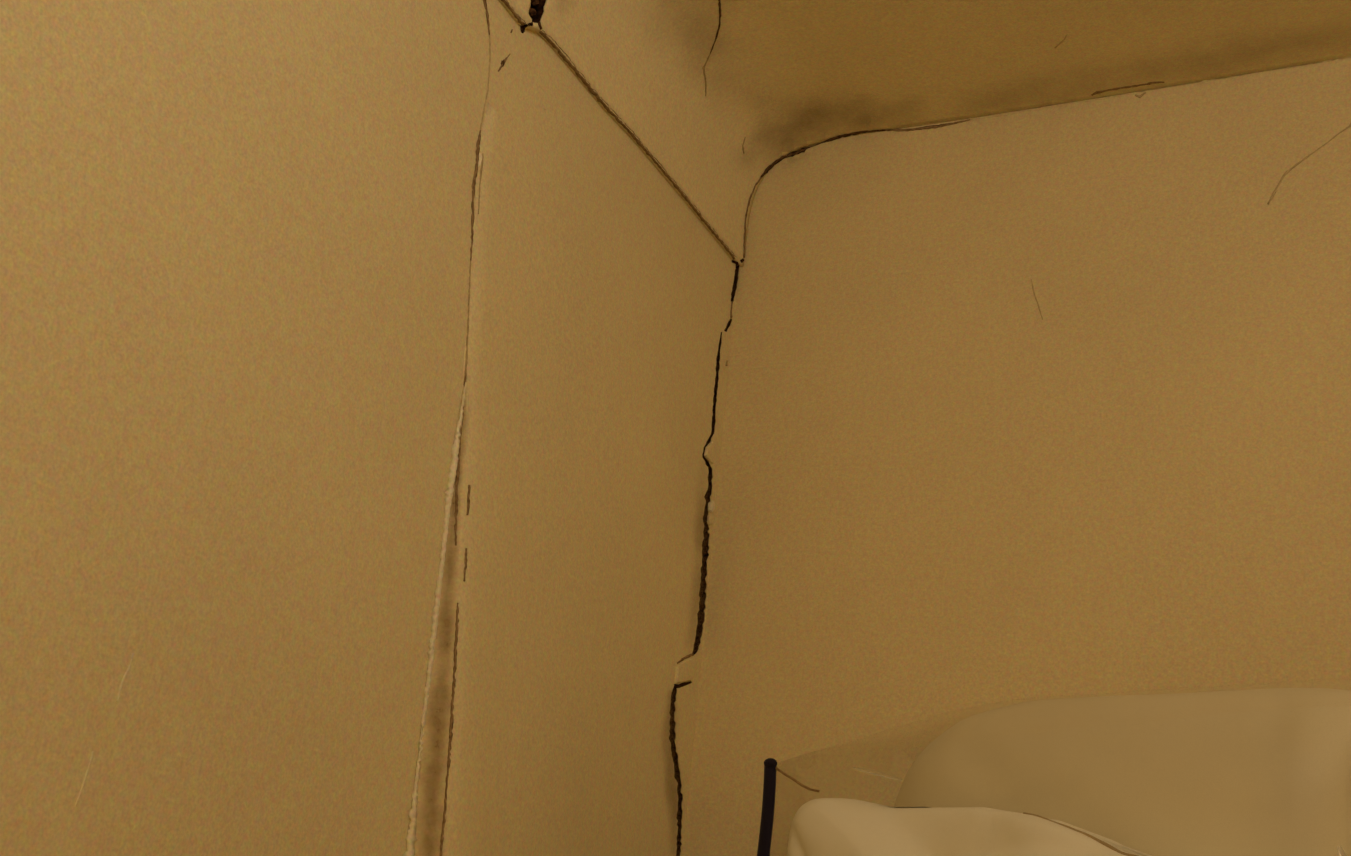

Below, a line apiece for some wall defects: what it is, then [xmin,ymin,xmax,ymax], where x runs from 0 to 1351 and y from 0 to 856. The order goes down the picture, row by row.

crack [465,0,1351,856]